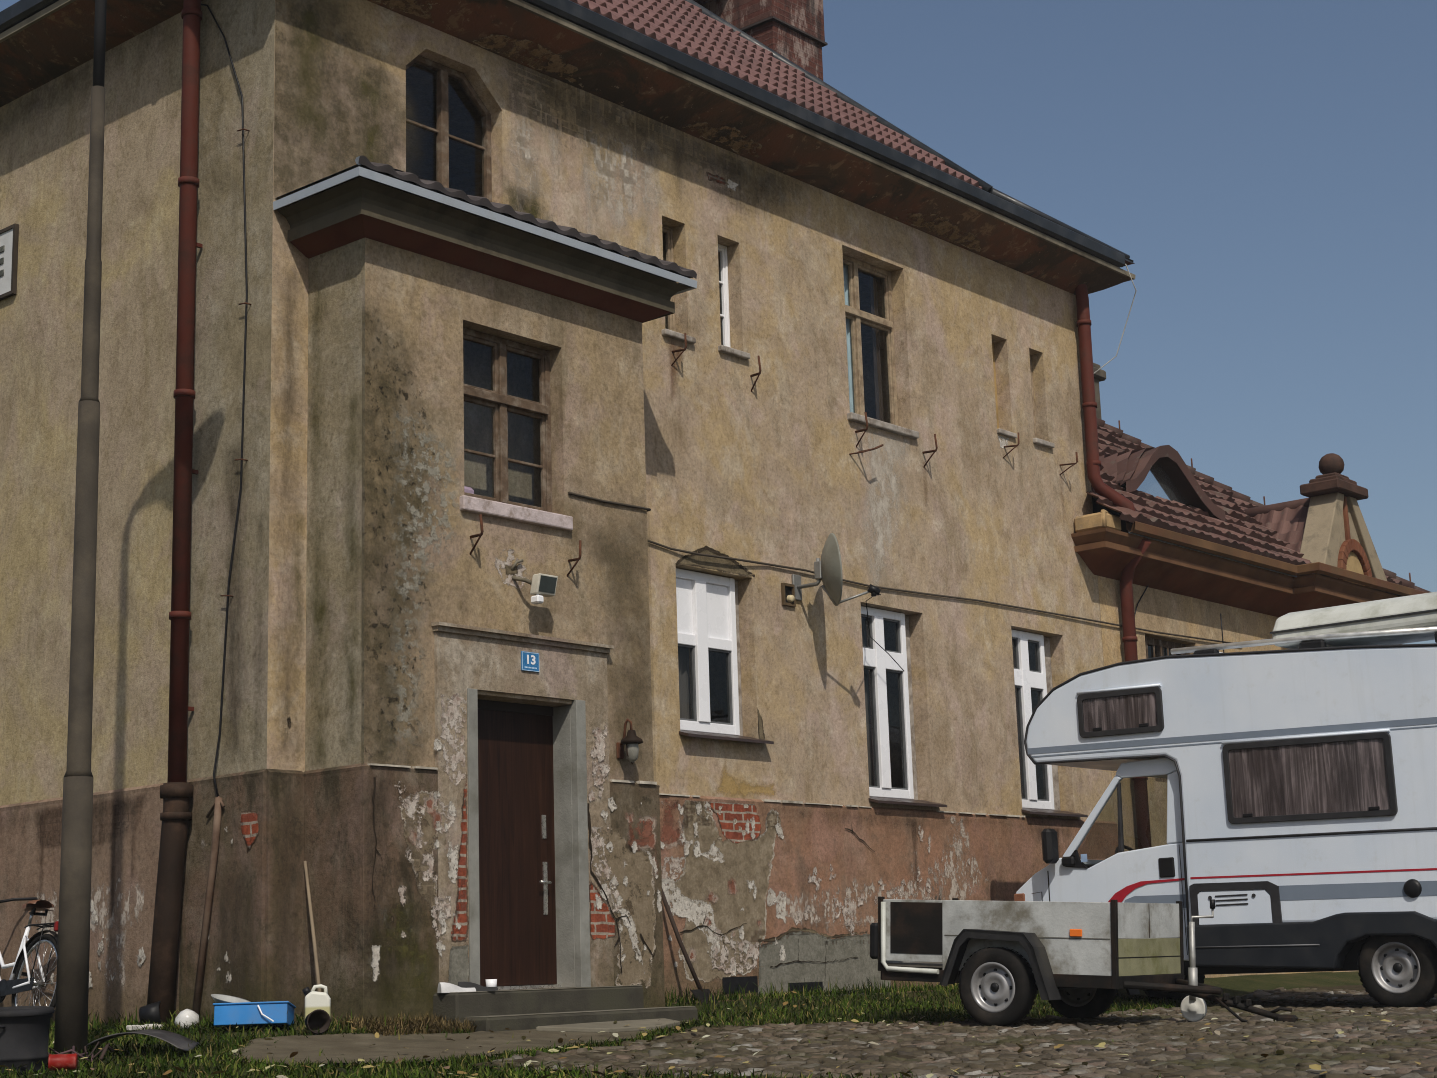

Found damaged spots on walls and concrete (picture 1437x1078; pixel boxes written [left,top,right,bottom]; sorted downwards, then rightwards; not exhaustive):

leakage [351,311,454,765]
spalling [371,945,380,981]
spalling [391,693,470,986]
peeling [588,725,981,998]